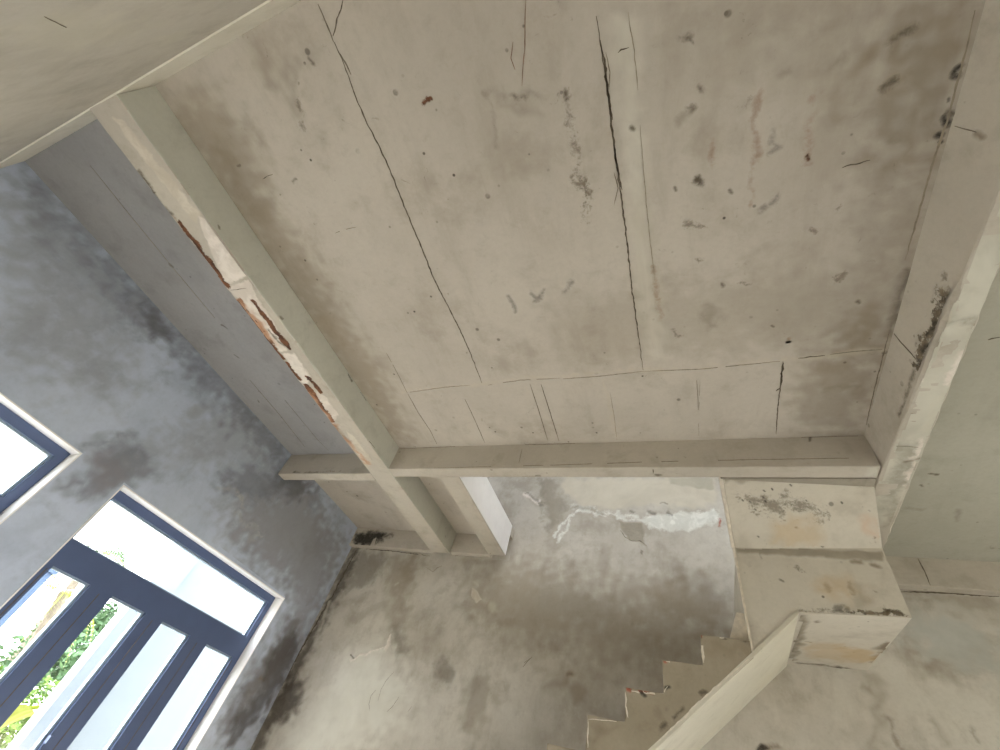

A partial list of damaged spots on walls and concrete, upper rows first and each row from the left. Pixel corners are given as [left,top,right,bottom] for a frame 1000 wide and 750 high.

flaking render [108,112,281,331]
rust [175,217,375,467]
flaking render [278,347,374,469]
crack [318,1,482,383]
damp [0,161,850,750]
damp [475,66,600,229]
crack [596,16,643,368]
damp [502,0,986,438]
crack [776,363,784,432]
crack [955,126,990,143]